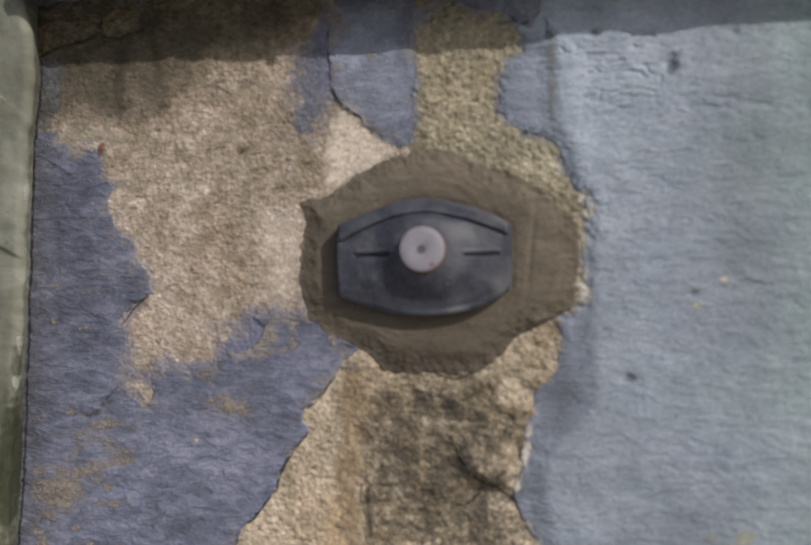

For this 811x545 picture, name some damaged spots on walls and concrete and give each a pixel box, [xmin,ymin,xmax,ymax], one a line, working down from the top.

crack [13,21,145,545]
peeling [31,0,594,545]
crack [444,436,514,506]